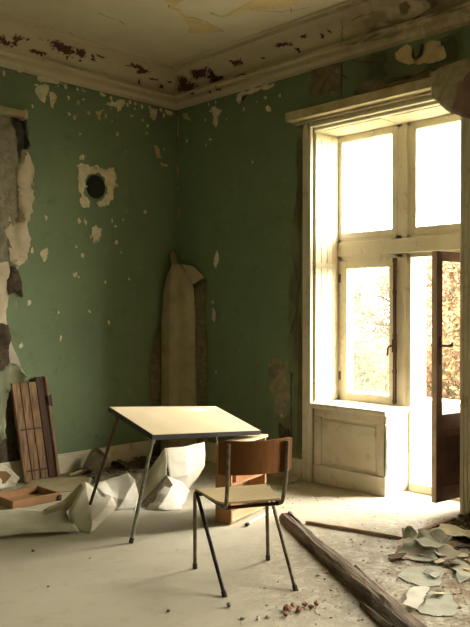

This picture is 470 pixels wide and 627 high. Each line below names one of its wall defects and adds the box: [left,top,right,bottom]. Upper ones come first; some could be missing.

peeling [0,34,29,48]
peeling [28,39,108,62]
peeling [395,40,446,65]
peeling [34,76,86,108]
peeling [125,62,224,97]
peeling [87,92,191,137]
peeling [205,101,227,127]
flaking render [0,115,22,266]
peeling [76,154,118,208]
peeling [78,218,102,244]
peeling [9,342,23,367]